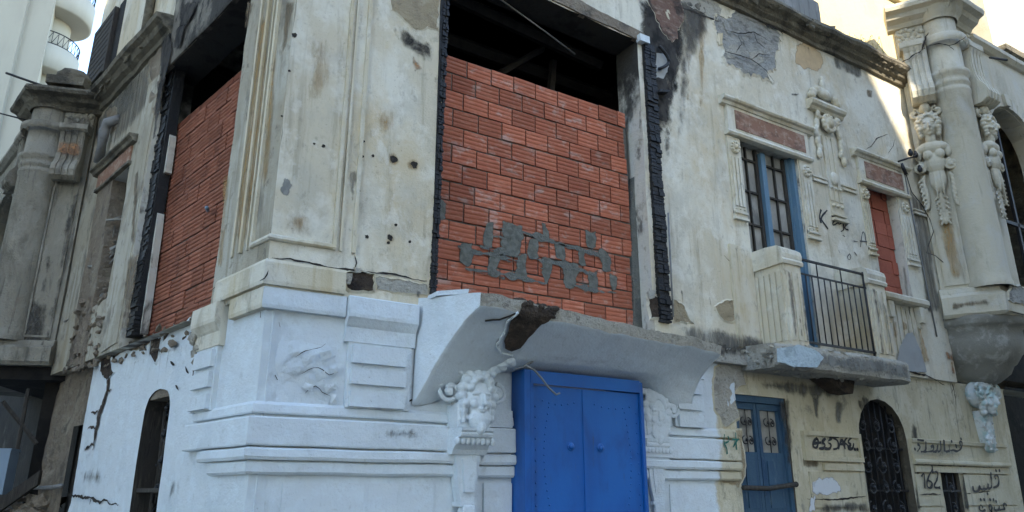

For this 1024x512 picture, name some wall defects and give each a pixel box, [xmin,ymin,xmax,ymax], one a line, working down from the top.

flaking render [389,0,440,32]
flaking render [646,0,782,85]
peeling [795,43,823,71]
crack [260,257,423,281]
spalling [495,297,560,357]
flaking render [714,299,735,324]
flaking render [100,356,115,381]
flaking render [148,332,199,374]
crack [84,378,111,450]
flaking render [711,345,904,489]
crack [65,492,119,506]